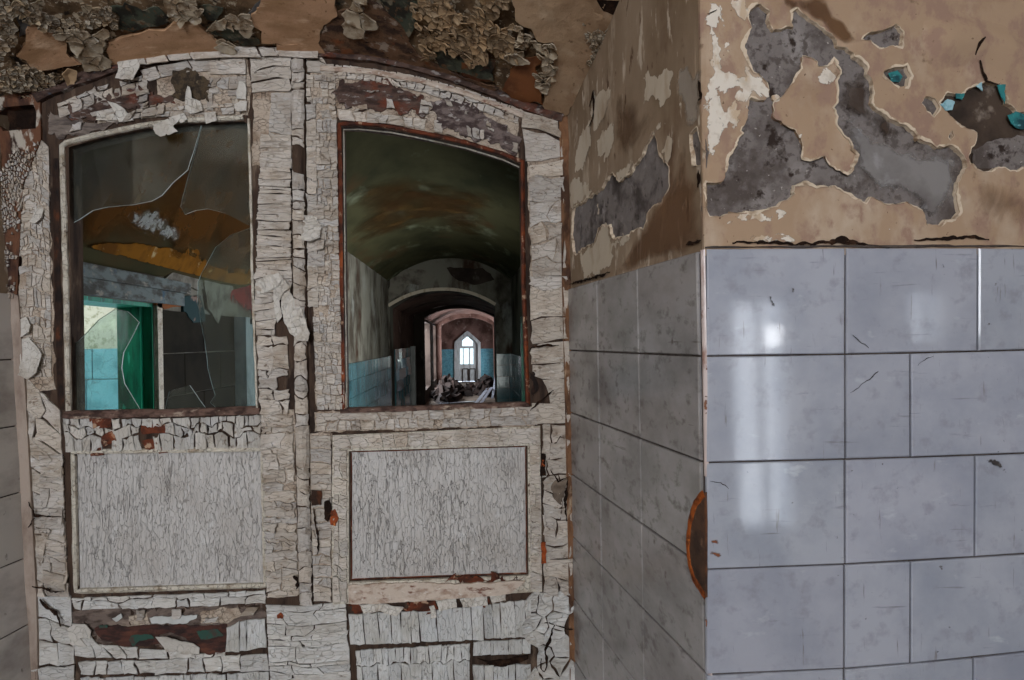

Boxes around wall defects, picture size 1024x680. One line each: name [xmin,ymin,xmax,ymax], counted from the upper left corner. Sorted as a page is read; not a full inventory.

peeling [0,0,261,140]
peeling [319,0,558,105]
peeling [331,78,523,156]
spalling [644,0,1024,227]
water stain [626,170,693,266]
crack [732,235,870,246]
crack [914,234,989,242]
crack [28,502,61,528]
corrosion [310,490,339,526]
crack [32,586,64,627]
peeling [67,601,267,655]
crack [540,622,573,672]